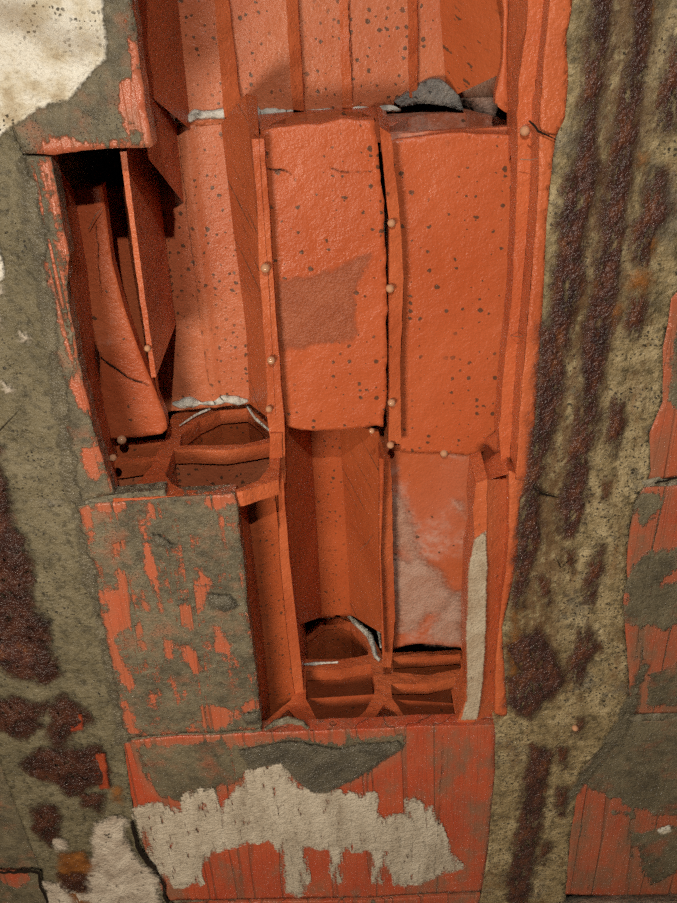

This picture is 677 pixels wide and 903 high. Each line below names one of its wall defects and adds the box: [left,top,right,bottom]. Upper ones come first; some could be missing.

water stain [0,0,107,135]
corrosion [502,0,677,720]
corrosion [0,476,62,685]
corrosion [0,693,120,813]
corrosion [28,803,92,903]
crack [130,821,169,903]
water stain [42,763,464,903]
corrosion [505,744,569,903]